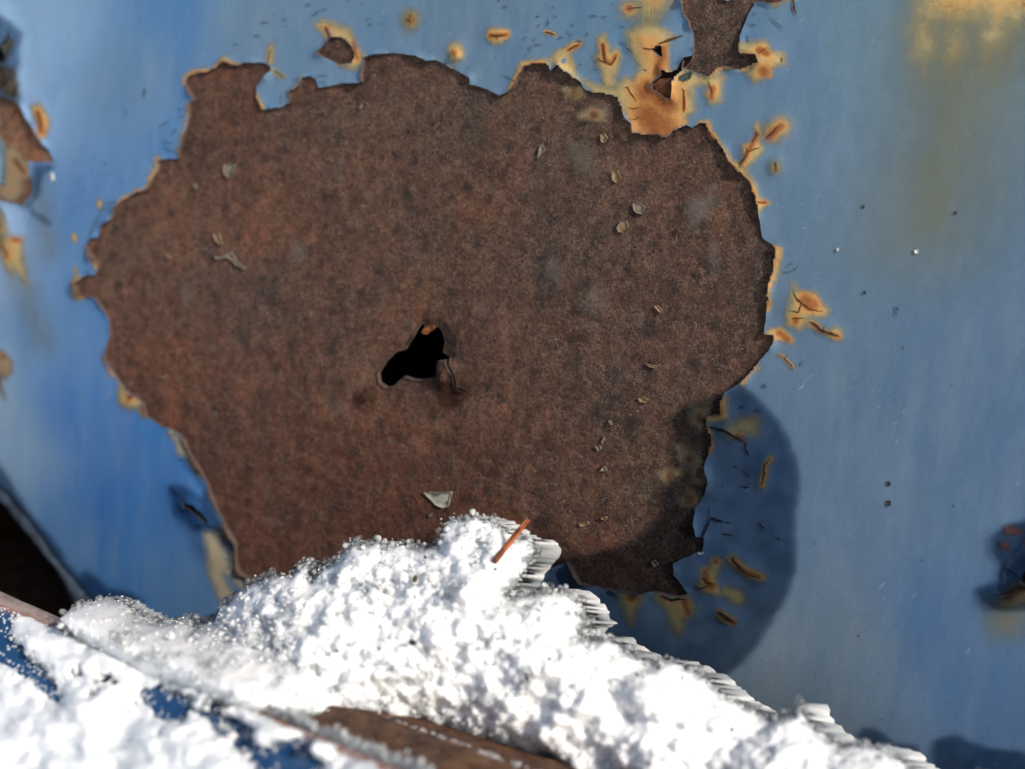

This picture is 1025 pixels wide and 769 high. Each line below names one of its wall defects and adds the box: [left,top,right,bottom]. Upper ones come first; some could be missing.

rust [447,42,464,62]
rust [551,0,725,137]
rust [738,40,785,81]
rust [915,0,1025,58]
rust [30,103,50,139]
rust [738,118,789,169]
rust [0,210,26,281]
peeling [71,20,780,596]
rust [766,286,843,369]
rust [118,389,141,409]
rust [204,531,251,603]
rust [656,555,765,635]